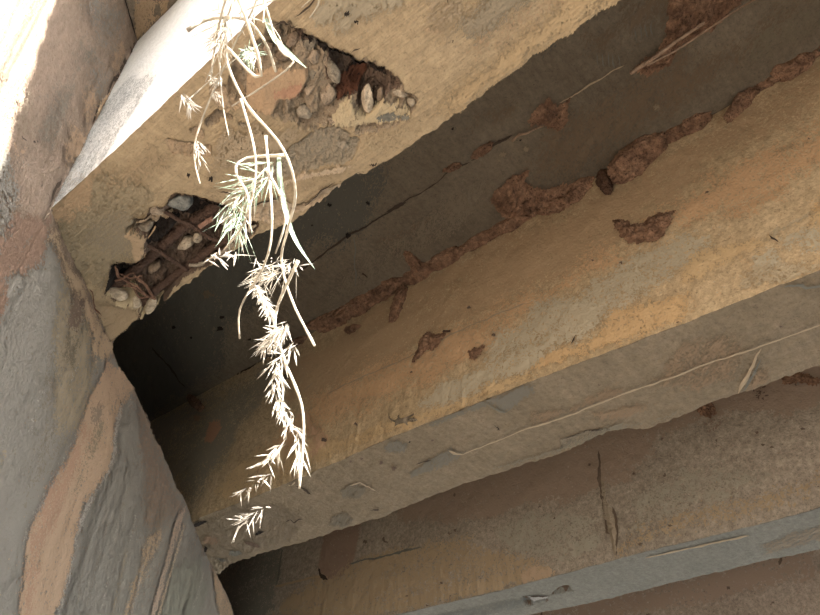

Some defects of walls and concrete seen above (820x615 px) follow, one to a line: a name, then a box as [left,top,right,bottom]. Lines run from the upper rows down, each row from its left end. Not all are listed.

spalling [104,21,418,320]
crack [253,159,476,300]
crack [492,135,512,147]
crack [597,451,618,555]